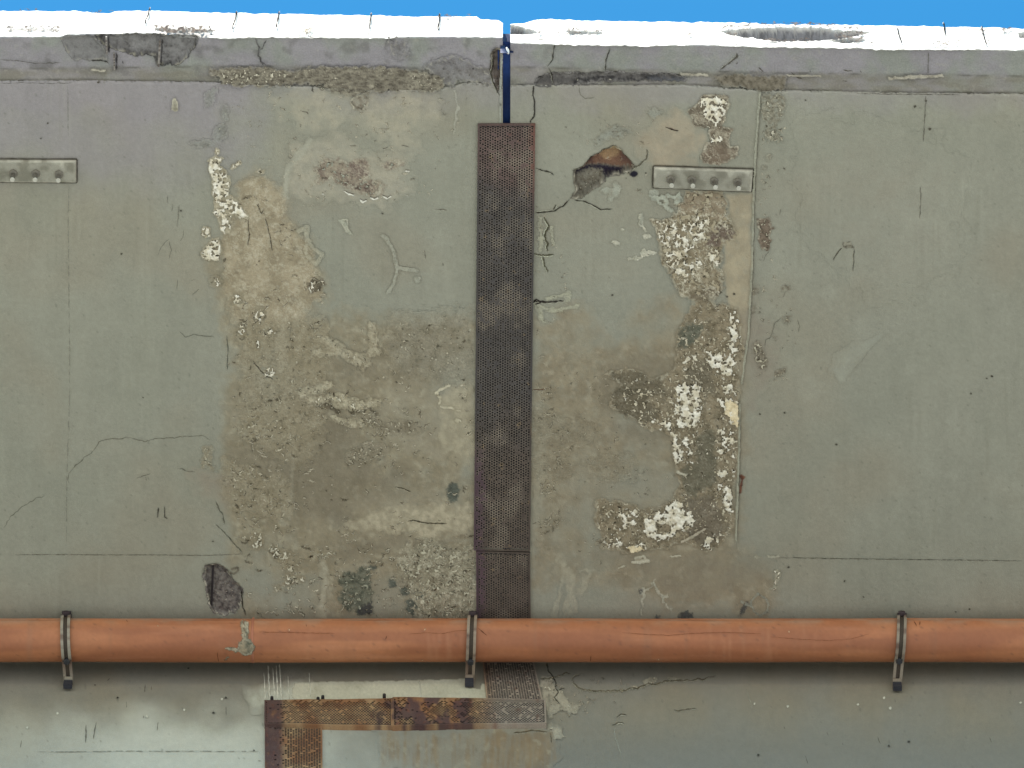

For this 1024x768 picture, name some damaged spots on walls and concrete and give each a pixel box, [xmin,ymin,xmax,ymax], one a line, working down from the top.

spalling [2,14,221,71]
spalling [570,145,635,200]
peeling [200,148,327,353]
crack [534,200,610,272]
crack [534,297,562,305]
damp [184,84,474,619]
peeling [683,313,787,459]
crack [68,435,208,477]
peeling [651,382,702,464]
peeling [612,500,696,550]
spalling [202,564,243,616]
crack [540,658,708,725]